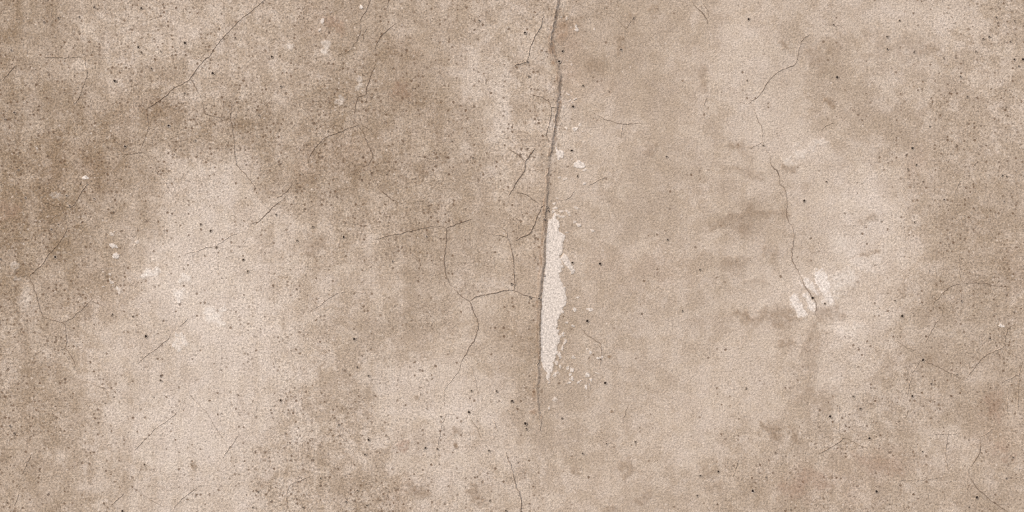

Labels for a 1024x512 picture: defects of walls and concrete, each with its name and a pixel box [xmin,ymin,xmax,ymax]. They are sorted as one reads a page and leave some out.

crack [379,94,605,448]
crack [516,15,544,65]
flaking render [540,197,603,410]
crack [726,24,843,319]